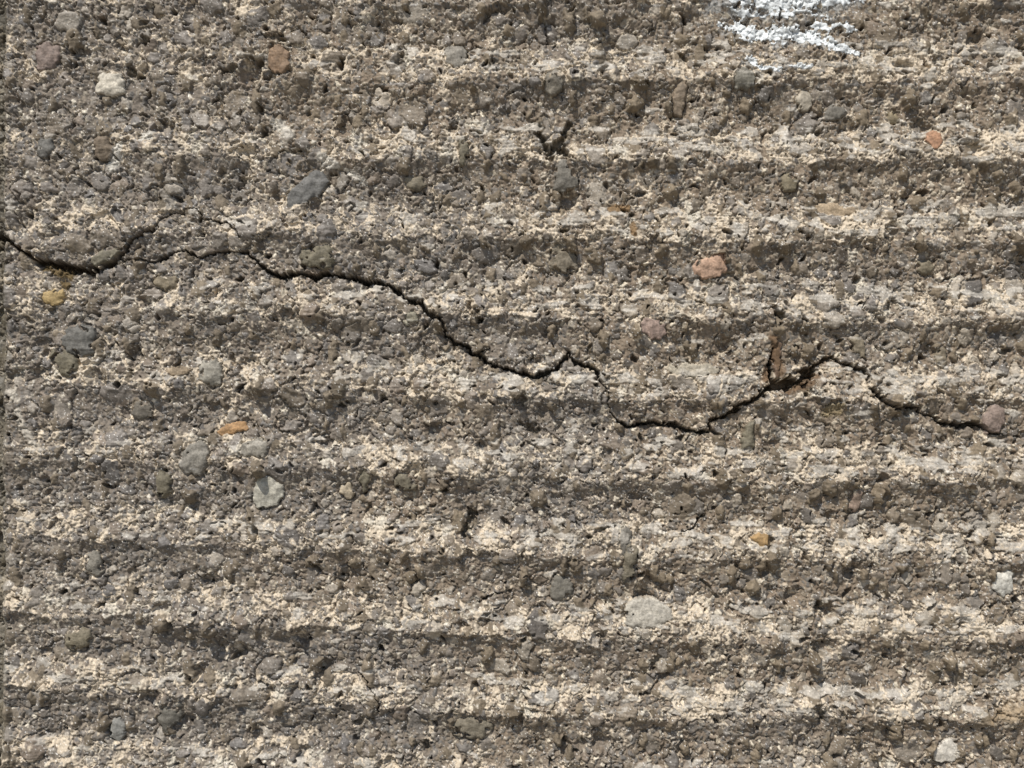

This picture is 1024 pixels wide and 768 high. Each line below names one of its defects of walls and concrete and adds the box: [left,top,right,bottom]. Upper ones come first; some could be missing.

crack [0,206,1007,437]